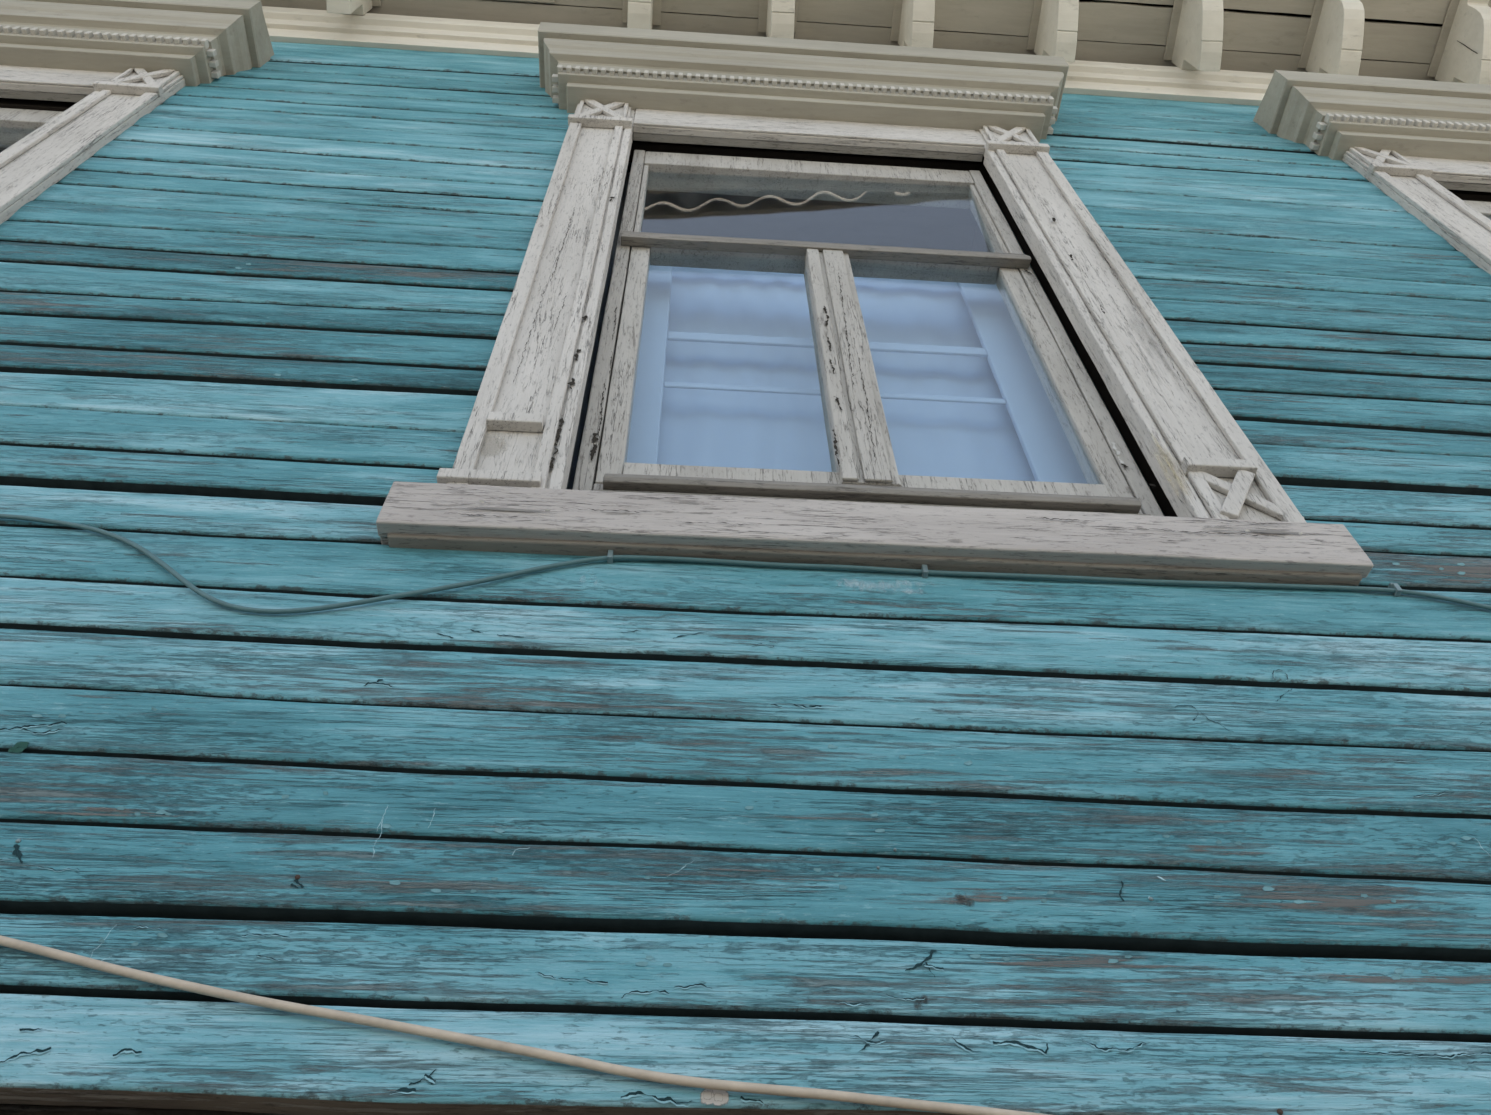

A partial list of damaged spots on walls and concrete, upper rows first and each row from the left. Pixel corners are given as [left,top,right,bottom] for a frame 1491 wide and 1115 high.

peeling [23,807,172,817]
peeling [900,888,1056,905]
peeling [1197,883,1436,916]
peeling [970,954,1207,969]
peeling [1301,968,1491,985]
crack [836,950,944,1051]
crack [0,1028,51,1064]
crack [112,1048,142,1058]
crack [952,1037,1049,1056]
crack [1084,1040,1146,1052]
crack [1340,1049,1491,1065]
crack [390,1069,436,1095]